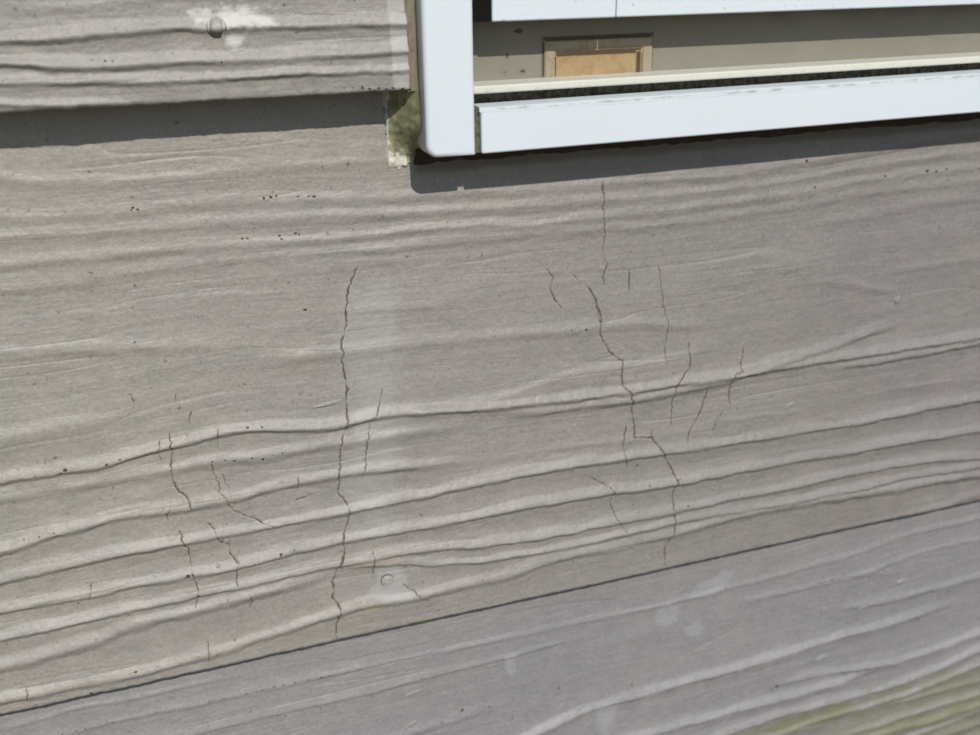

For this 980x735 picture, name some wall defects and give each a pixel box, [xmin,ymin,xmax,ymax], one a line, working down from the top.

crack [158,433,252,609]
crack [211,428,274,527]
crack [331,266,391,640]
crack [547,183,745,566]